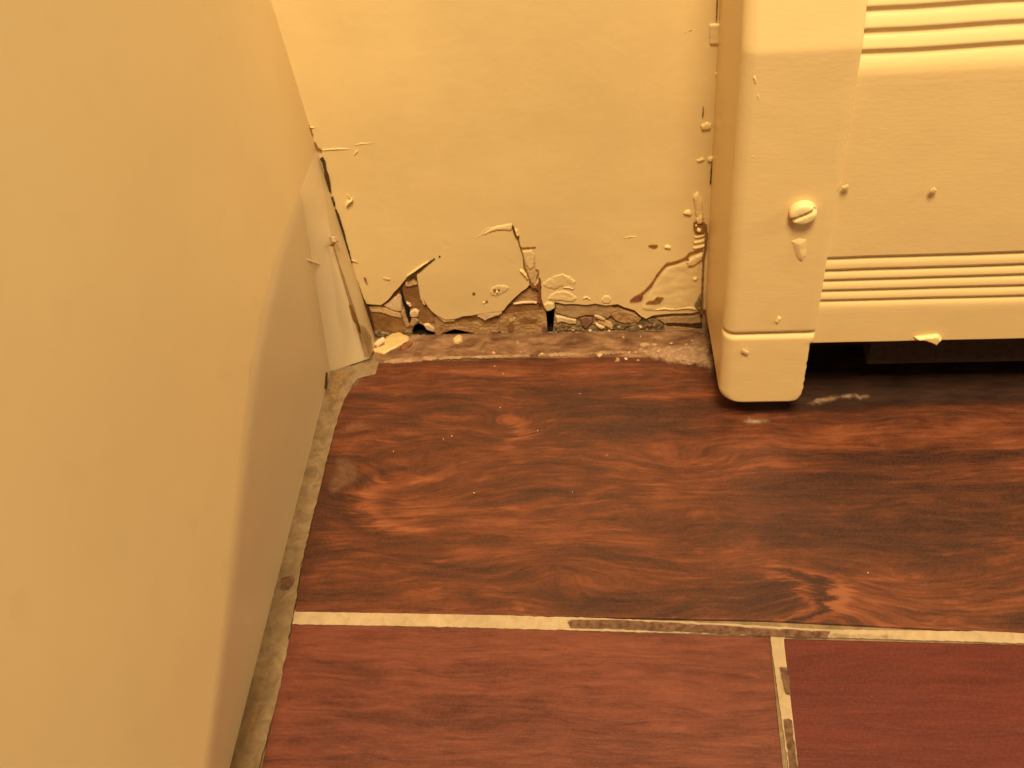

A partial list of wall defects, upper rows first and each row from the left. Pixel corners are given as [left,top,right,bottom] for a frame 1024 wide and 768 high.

peeling [475,223,519,239]
flaking render [329,237,703,358]